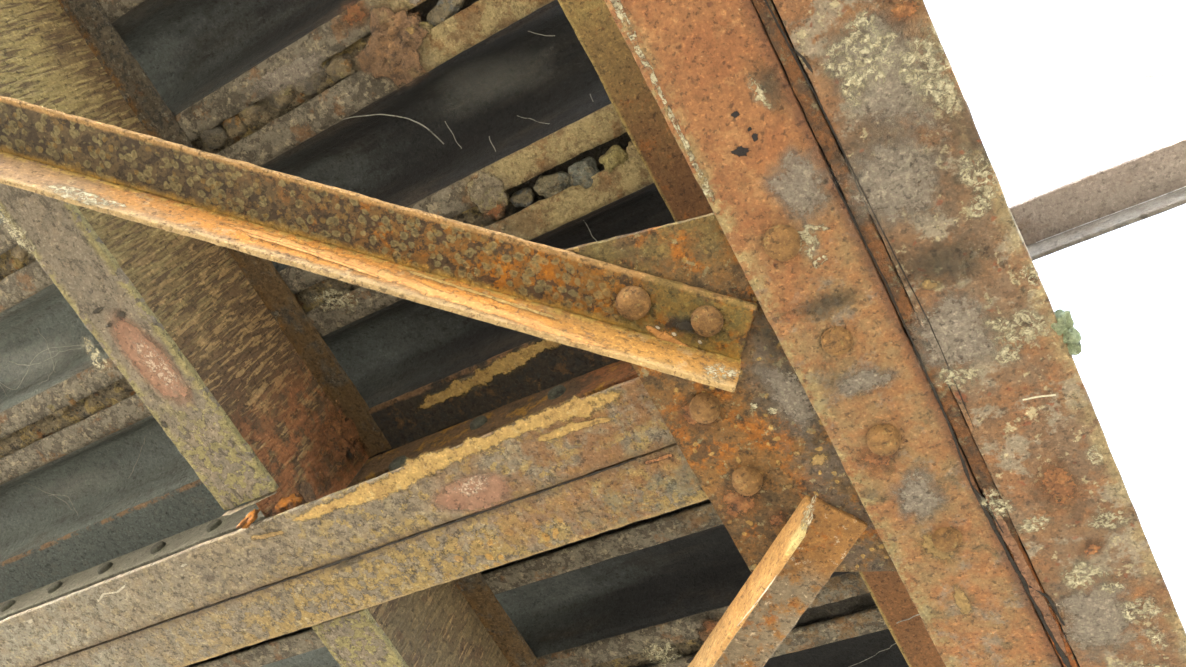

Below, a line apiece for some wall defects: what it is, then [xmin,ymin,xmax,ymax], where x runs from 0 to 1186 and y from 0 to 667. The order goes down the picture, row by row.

rust [224,223,606,409]
rust [646,326,702,348]
peeling [292,391,620,521]